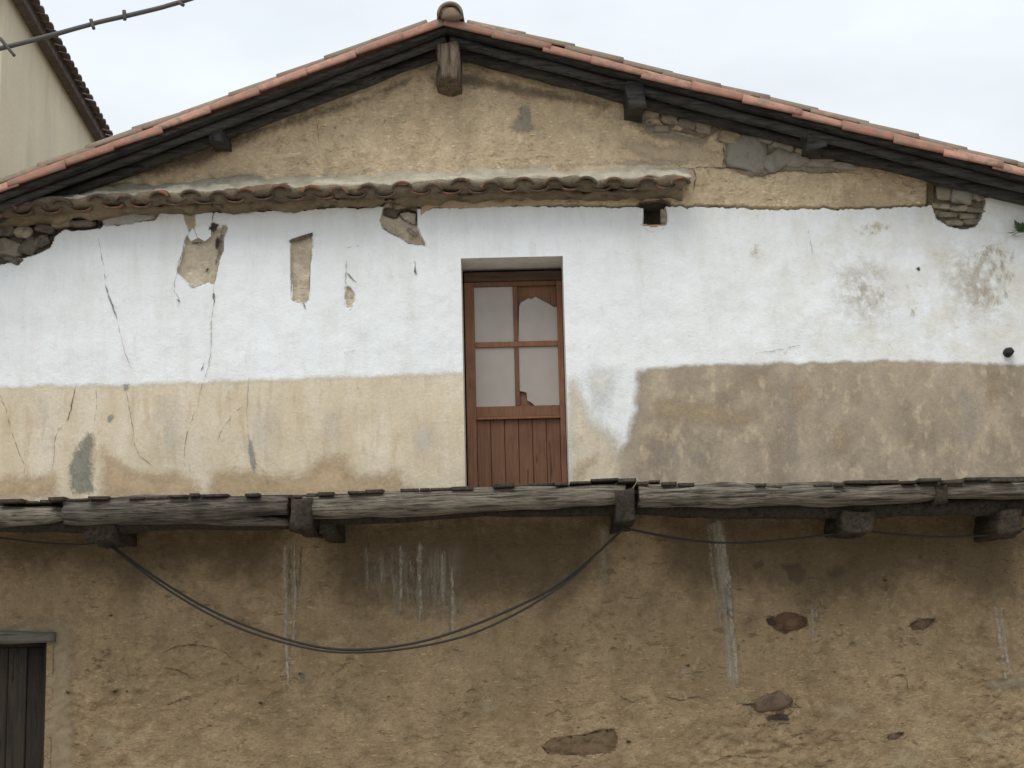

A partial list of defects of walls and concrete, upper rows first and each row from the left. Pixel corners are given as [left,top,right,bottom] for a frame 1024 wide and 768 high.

flaking render [642,110,861,177]
spalling [177,211,227,289]
spalling [289,233,313,307]
spalling [345,286,355,310]
spalling [379,197,552,247]
water stain [0,373,465,502]
water stain [339,529,589,638]
spalling [766,612,809,634]
water stain [674,519,1007,689]
spalling [908,617,939,633]
spalling [542,727,618,757]